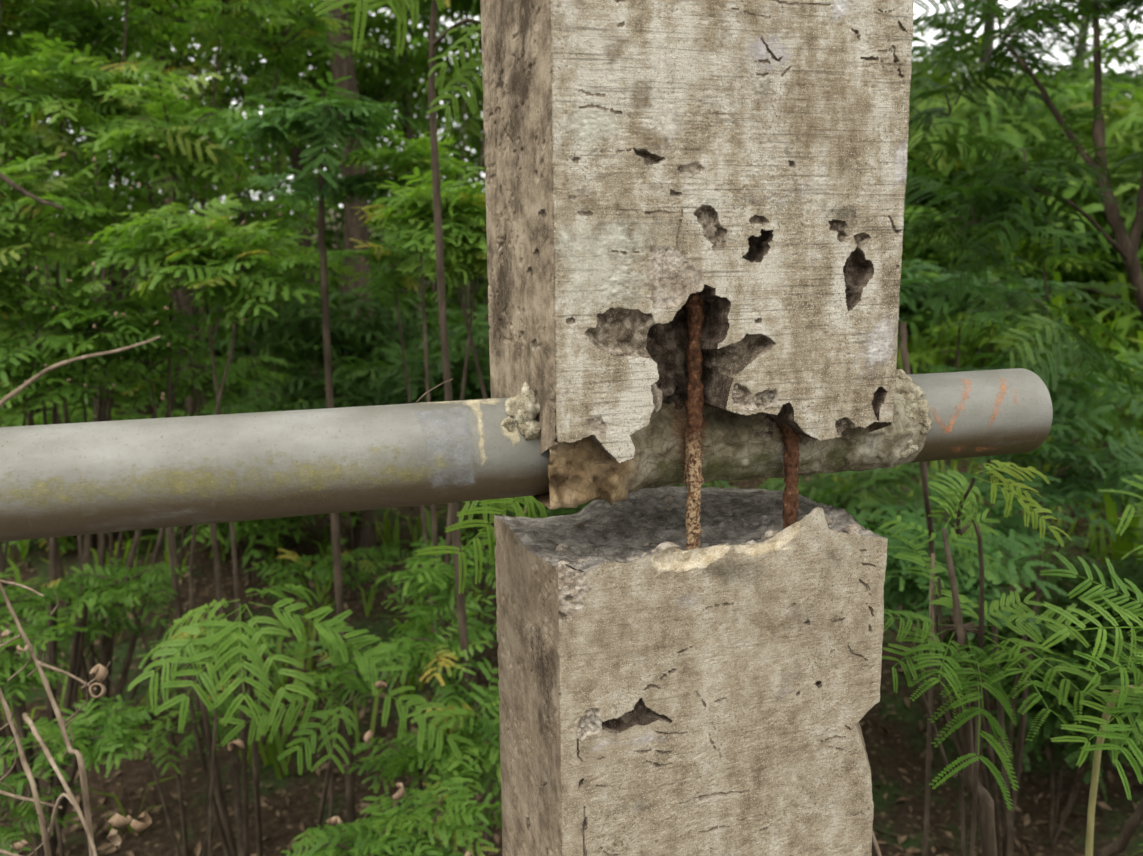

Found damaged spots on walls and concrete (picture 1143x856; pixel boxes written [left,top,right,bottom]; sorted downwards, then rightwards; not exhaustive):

spalling [693,204,727,250]
spalling [828,219,874,311]
spalling [566,245,822,441]
peeling [587,415,628,463]
spalling [835,386,887,437]
spalling [651,521,800,573]
spalling [558,564,592,623]
spalling [575,698,672,762]